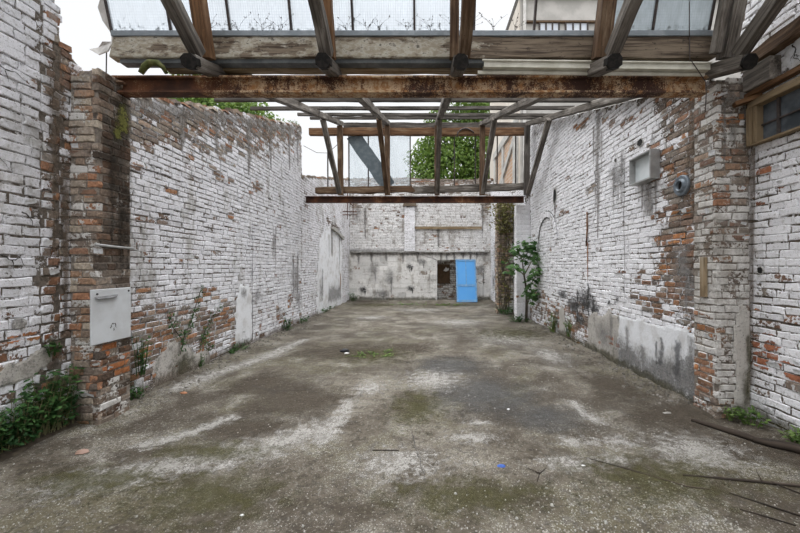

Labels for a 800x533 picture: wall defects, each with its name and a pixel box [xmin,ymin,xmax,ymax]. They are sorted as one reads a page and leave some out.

peeling [602,108,646,129]
peeling [723,164,783,191]
peeling [0,45,103,392]
peeling [617,98,751,339]
spalling [87,287,246,394]
damp [601,320,694,391]
spalling [692,342,716,401]
peeling [751,327,800,383]